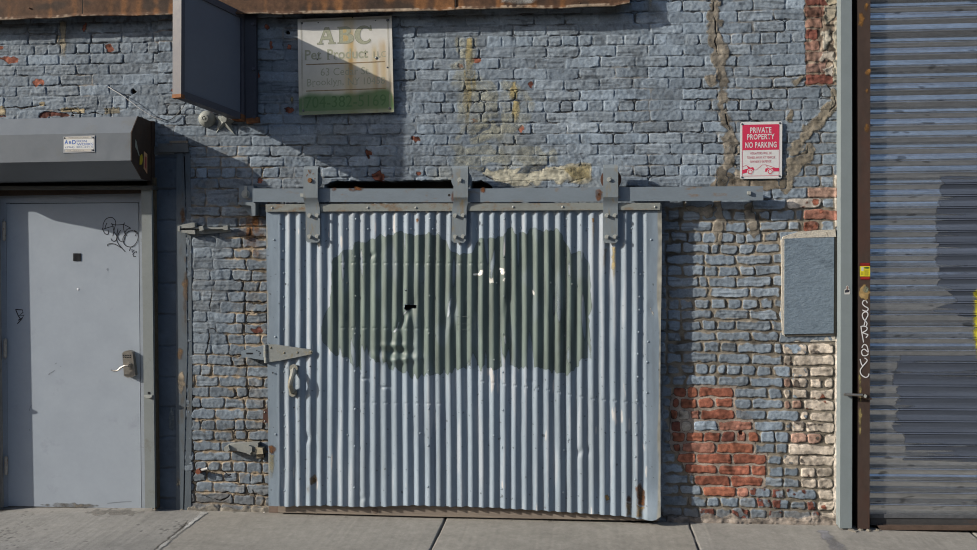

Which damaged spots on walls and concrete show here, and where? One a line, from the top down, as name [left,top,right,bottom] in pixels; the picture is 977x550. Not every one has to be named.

damp [454,38,519,164]
crack [704,0,740,186]
spalling [803,0,837,86]
damp [482,163,592,186]
peeling [668,339,837,521]
corrosion [627,484,645,517]